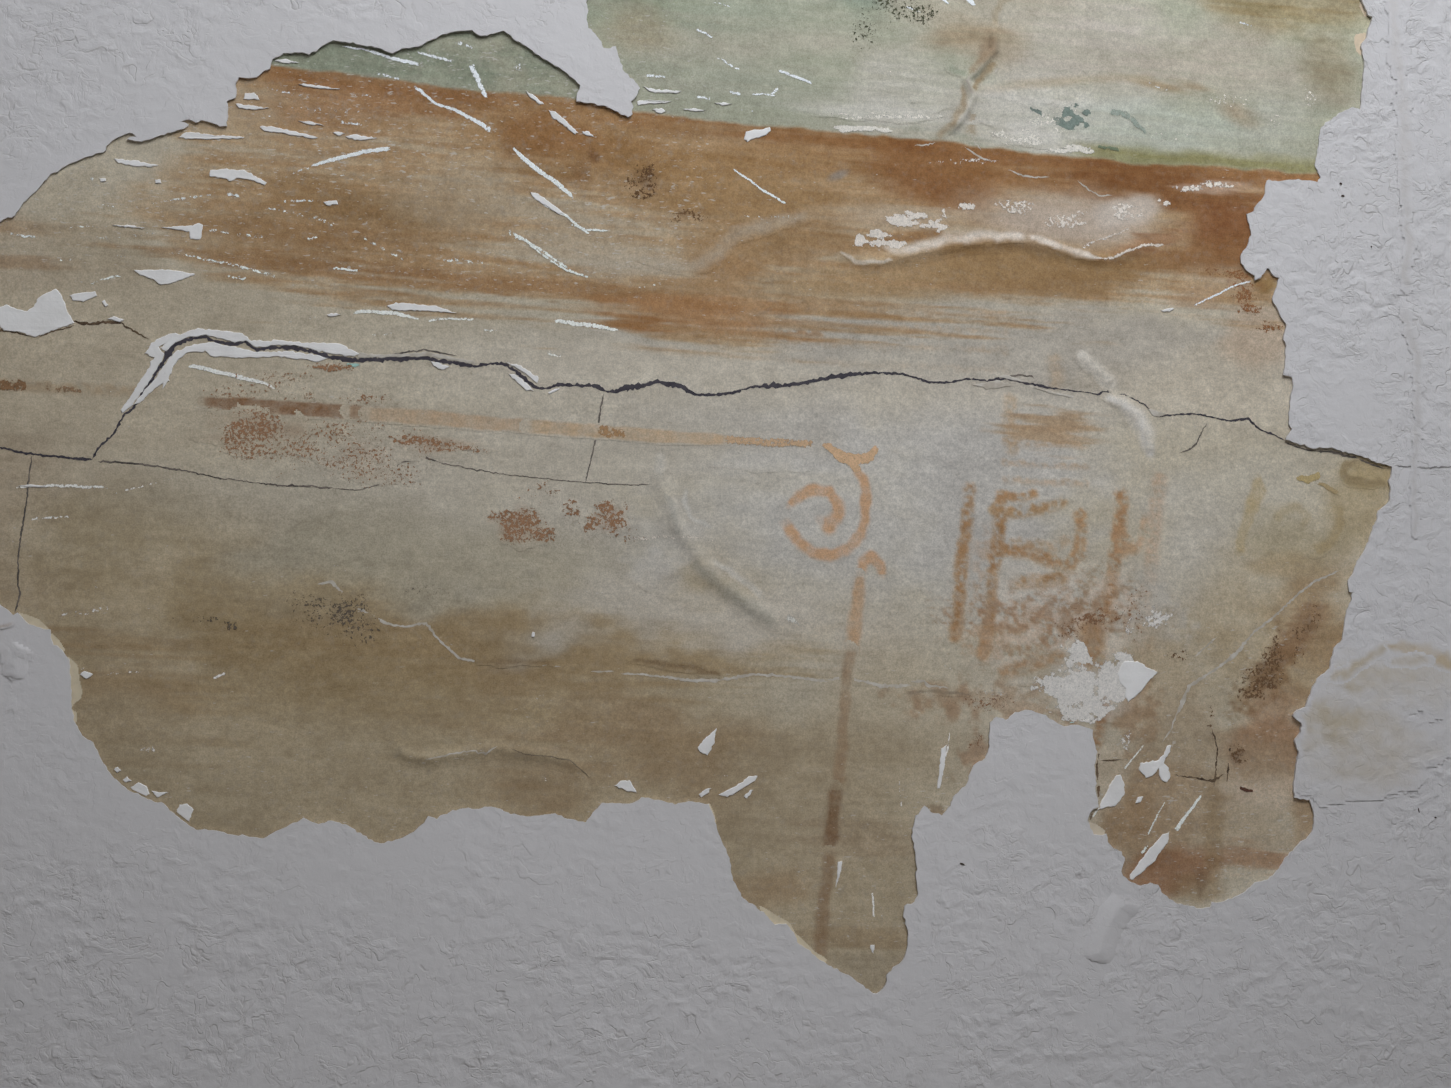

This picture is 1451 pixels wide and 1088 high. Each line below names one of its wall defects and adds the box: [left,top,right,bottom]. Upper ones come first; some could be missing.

peeling [469,64,487,97]
peeling [734,169,786,204]
rust [1198,268,1283,333]
rust [186,363,499,493]
crack [0,320,1451,611]
rust [484,480,644,551]
rust [1055,586,1157,640]
peeling [1175,795,1201,831]